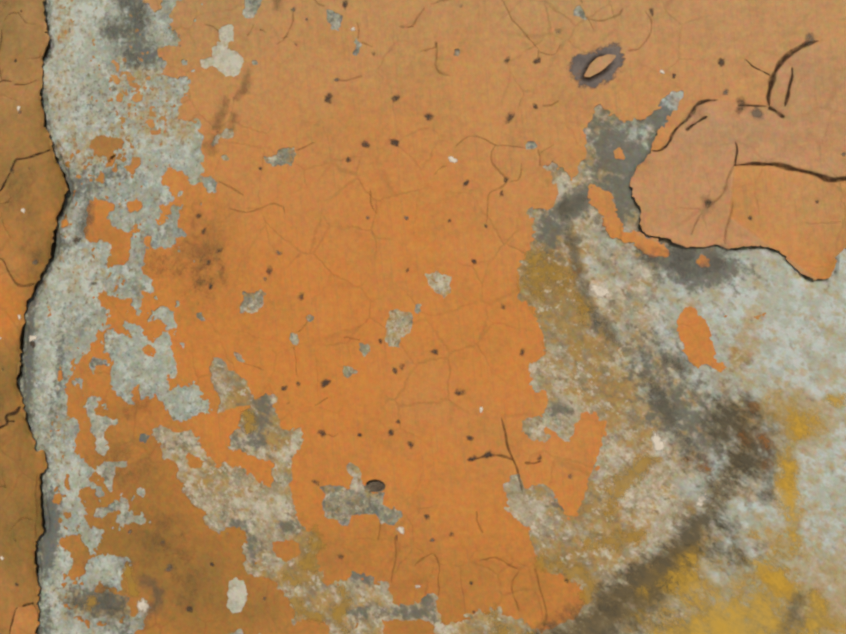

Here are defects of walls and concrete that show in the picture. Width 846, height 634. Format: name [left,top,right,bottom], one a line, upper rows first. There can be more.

peeling [242,0,262,18]
peeling [326,1,348,31]
peeling [200,24,244,77]
crack [738,40,818,118]
crack [652,99,716,151]
crack [0,149,50,191]
crack [734,142,846,182]
peeling [10,0,217,634]
peeling [139,90,846,634]
crack [0,406,21,429]
crack [480,417,537,488]
damp [536,397,778,634]